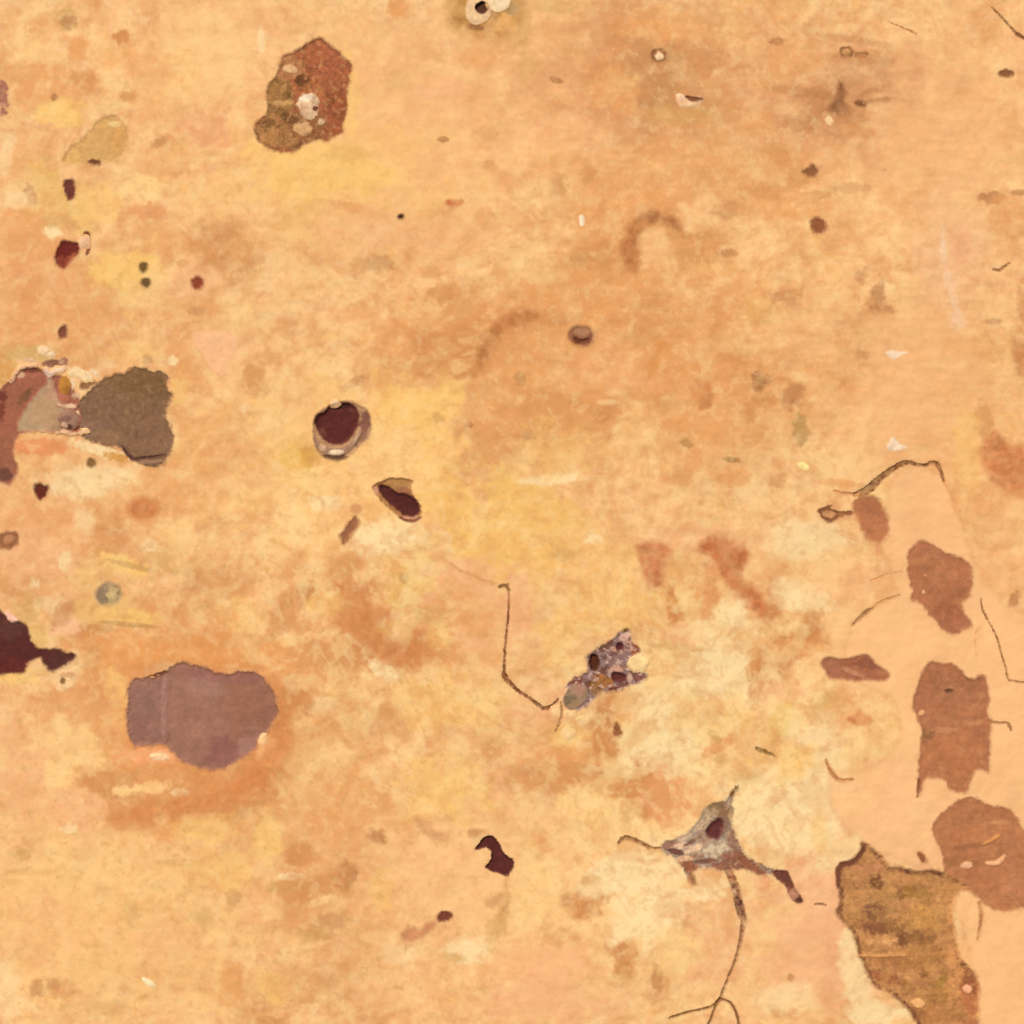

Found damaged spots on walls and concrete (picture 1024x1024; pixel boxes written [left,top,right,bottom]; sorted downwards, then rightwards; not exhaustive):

spalling [251,34,355,155]
spalling [0,322,177,488]
crack [831,459,963,514]
spalling [0,606,79,693]
spalling [123,658,282,773]
crack [497,581,564,733]
spalling [560,625,650,713]
spalling [818,652,892,684]
spalling [904,538,975,637]
crack [972,596,1024,684]
spalling [832,659,1024,1024]
spalling [616,782,805,1024]